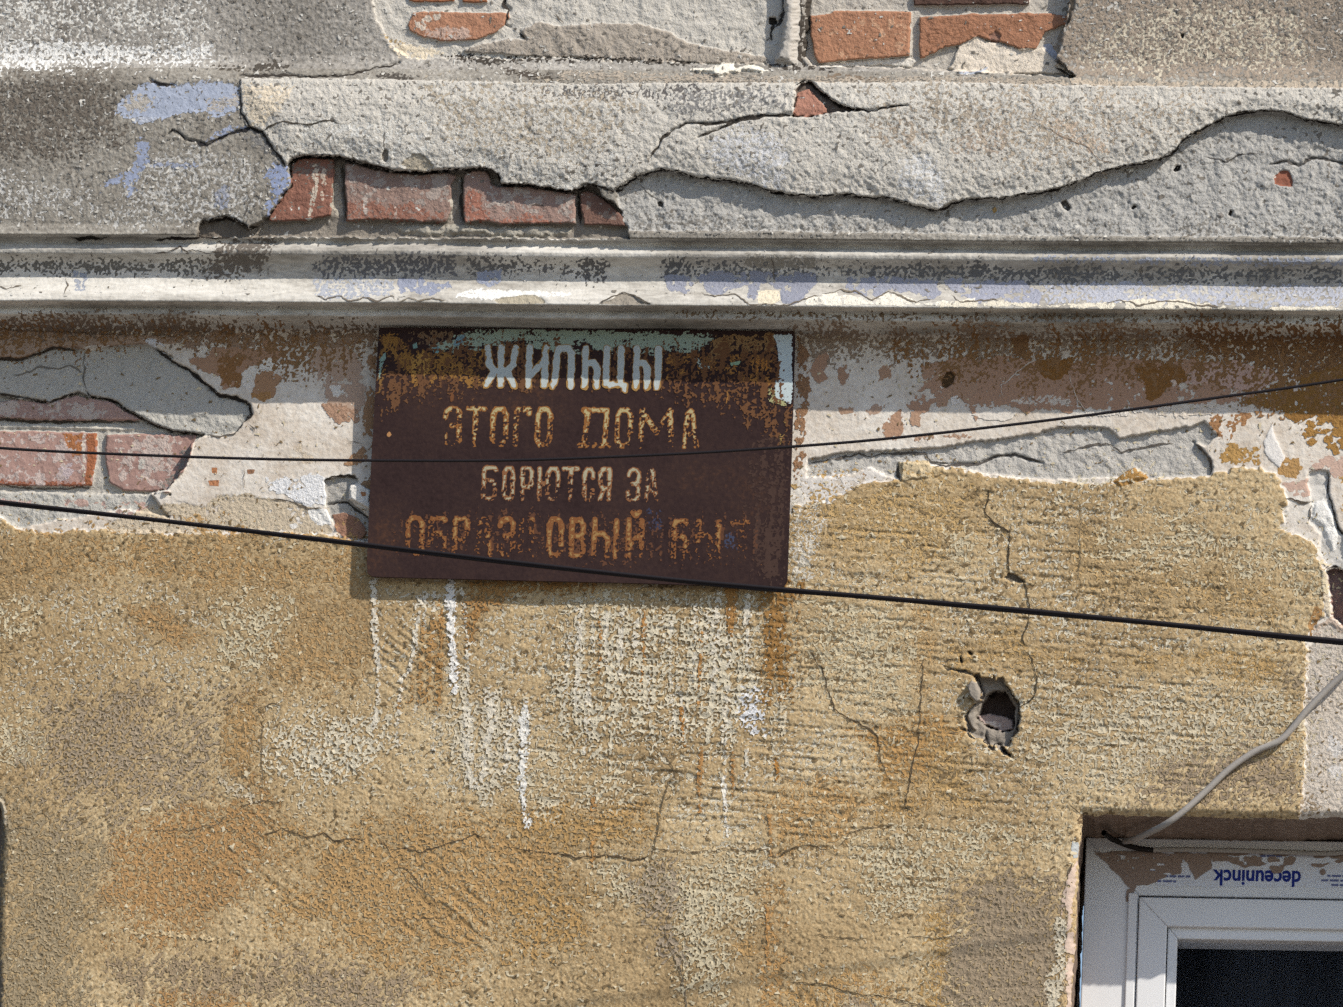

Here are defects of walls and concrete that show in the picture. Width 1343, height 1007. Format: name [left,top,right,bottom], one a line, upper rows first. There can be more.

crack [168,0,1343,224]
flaking render [197,0,1343,240]
spalling [0,329,283,528]
spalling [290,475,370,541]
peeling [307,346,367,424]
spalling [1004,573,1025,583]
crack [1001,348,1036,395]
spalling [807,353,1298,480]
spalling [1264,425,1343,638]
damp [0,433,1343,1007]
crack [151,374,1212,1007]
spalling [965,674,1020,757]